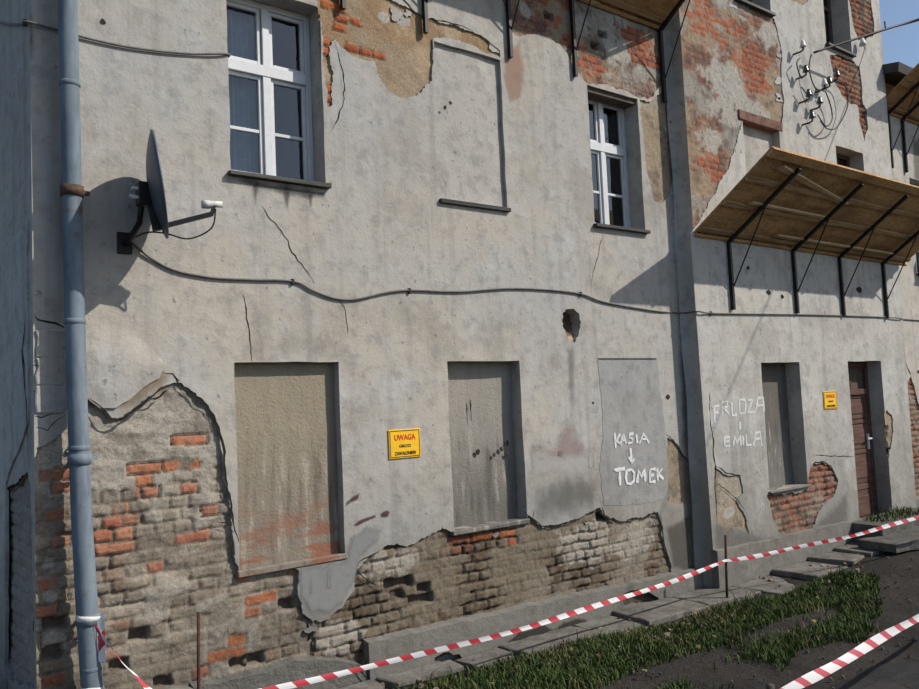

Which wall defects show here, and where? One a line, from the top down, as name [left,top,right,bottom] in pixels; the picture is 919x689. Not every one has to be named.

flaking render [316,0,500,107]
flaking render [502,0,673,203]
flaking render [679,0,783,228]
flaking render [830,55,867,137]
crack [7,314,66,490]
flaking render [8,427,81,689]
crack [89,372,239,541]
crack [243,295,252,358]
crack [263,207,314,282]
flaking render [88,383,670,689]
flaking render [767,462,837,534]
flaking render [908,370,919,498]